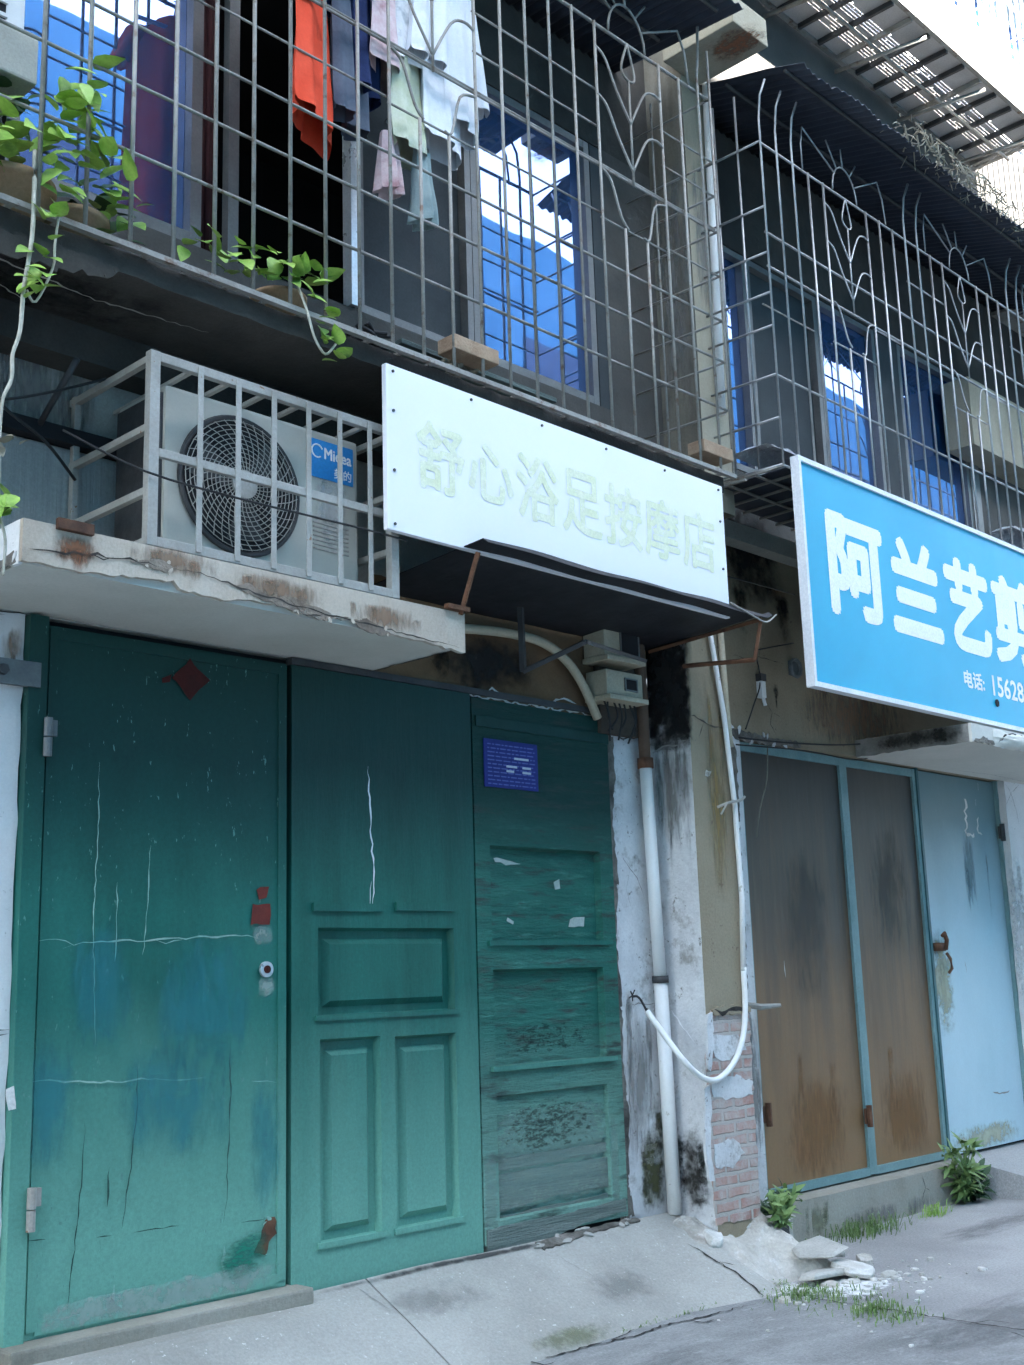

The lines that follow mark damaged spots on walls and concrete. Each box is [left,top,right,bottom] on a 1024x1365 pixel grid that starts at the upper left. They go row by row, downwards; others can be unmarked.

corrosion [714,30,764,59]
spalling [0,550,17,569]
corrosion [61,539,93,566]
crack [33,549,453,671]
water stain [437,639,528,688]
spalling [730,724,801,907]
water stain [627,1000,664,1204]
spalling [703,923,761,1226]
water stain [678,1139,707,1206]